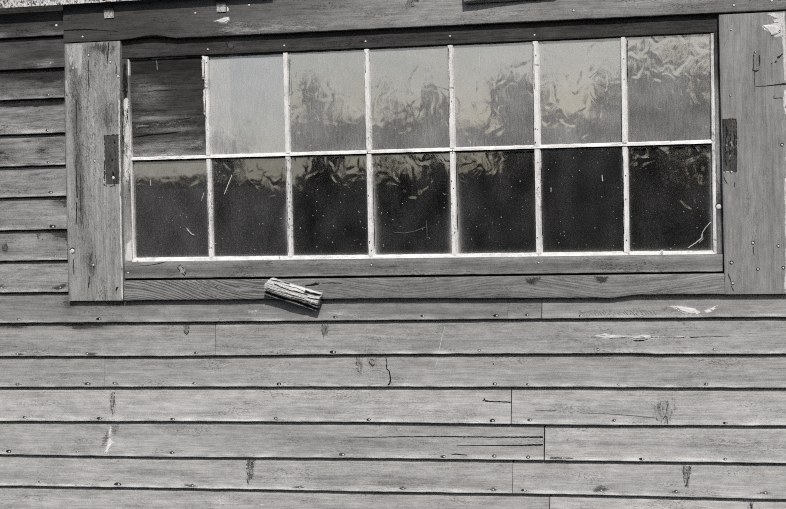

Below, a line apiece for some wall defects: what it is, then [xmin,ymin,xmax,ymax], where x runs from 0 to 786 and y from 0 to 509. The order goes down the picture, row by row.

peeling [762,12,786,114]
peeling [670,305,718,315]
crack [633,334,721,342]
crack [365,436,543,455]